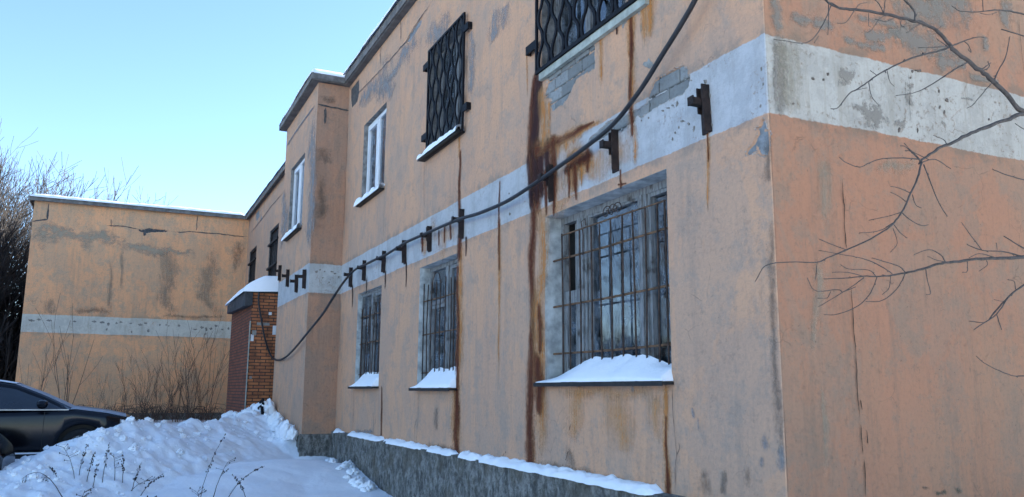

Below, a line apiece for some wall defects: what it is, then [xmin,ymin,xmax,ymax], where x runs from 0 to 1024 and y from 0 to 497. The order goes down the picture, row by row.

flaking render [544,44,595,111]
rust [616,0,654,160]
flaking render [587,58,711,143]
flaking render [745,104,771,158]
crack [179,194,282,237]
rust [438,136,467,454]
rust [525,74,598,463]
crack [840,179,848,248]
rust [662,386,671,494]
crack [851,290,868,496]